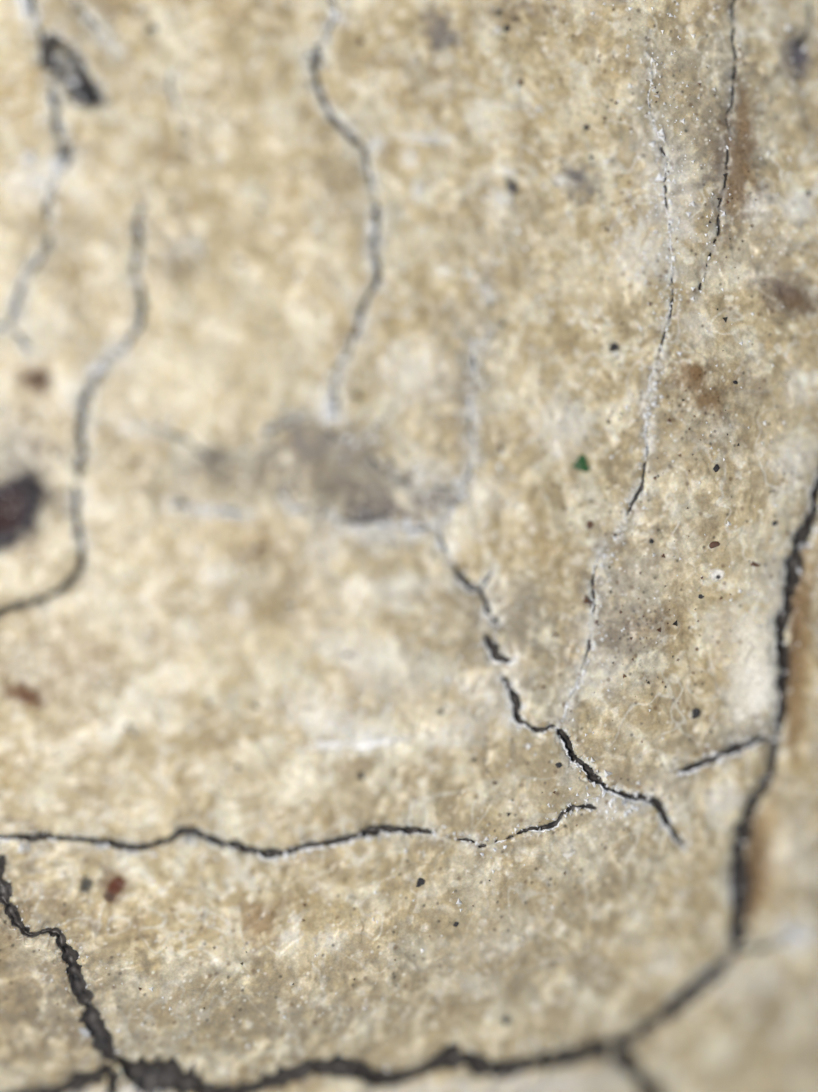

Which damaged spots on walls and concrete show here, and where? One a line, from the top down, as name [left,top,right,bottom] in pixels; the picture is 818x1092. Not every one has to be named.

crack [75,283,147,481]
crack [627,462,646,514]
crack [0,484,86,617]
crack [449,559,491,615]
crack [483,633,516,665]
crack [499,676,556,733]
crack [0,824,433,861]
crack [517,804,596,834]
crack [555,727,686,850]
crack [623,475,818,1092]
crack [0,854,141,1092]
crack [112,953,735,1092]